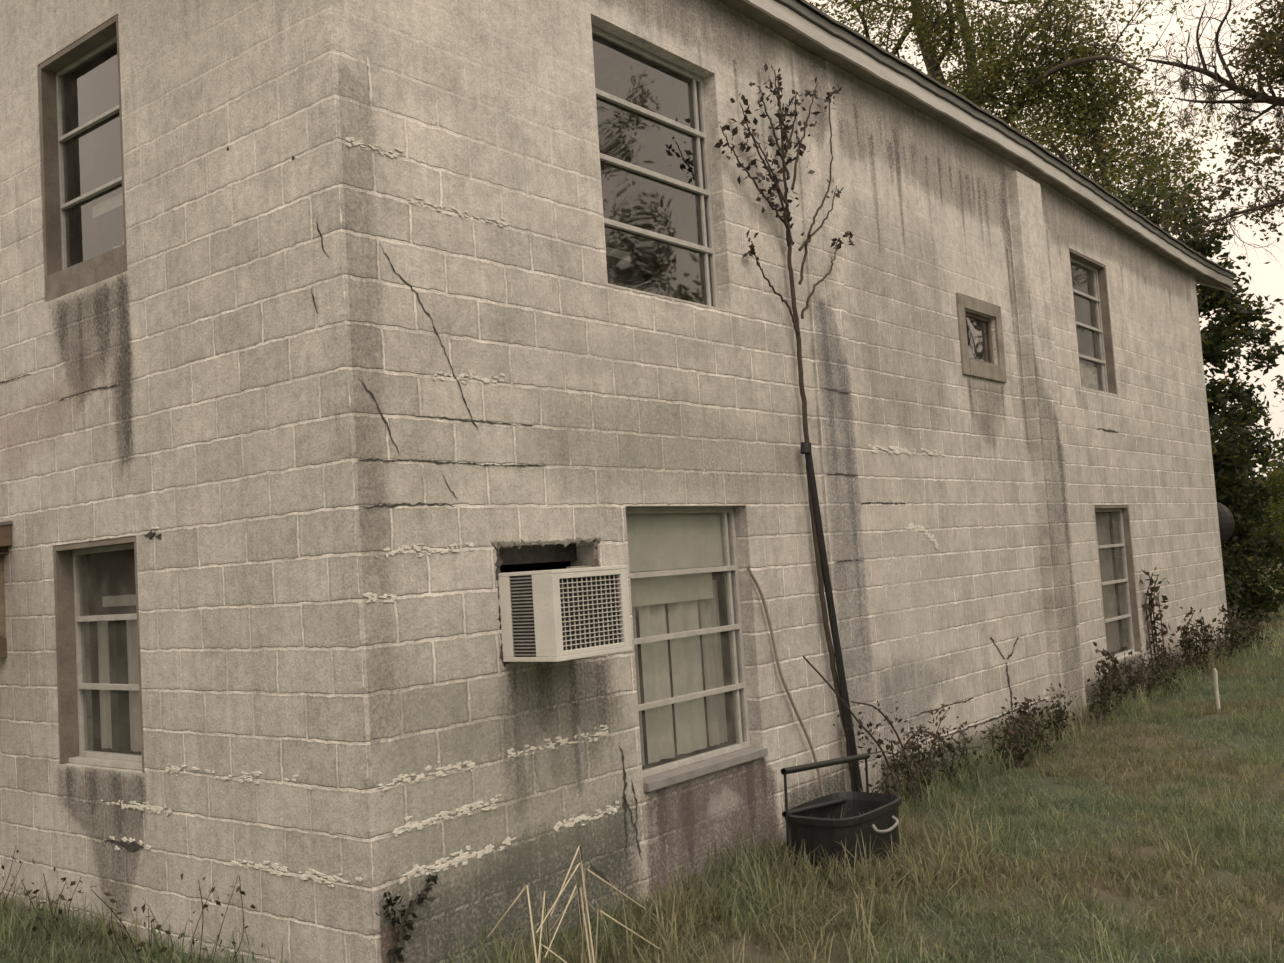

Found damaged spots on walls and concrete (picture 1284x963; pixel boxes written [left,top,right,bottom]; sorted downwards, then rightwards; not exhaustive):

crack [359,242,546,509]
peeling [507,725,609,758]
peeling [377,760,476,791]
peeling [392,794,502,837]
peeling [553,801,620,832]
peeling [399,837,517,884]